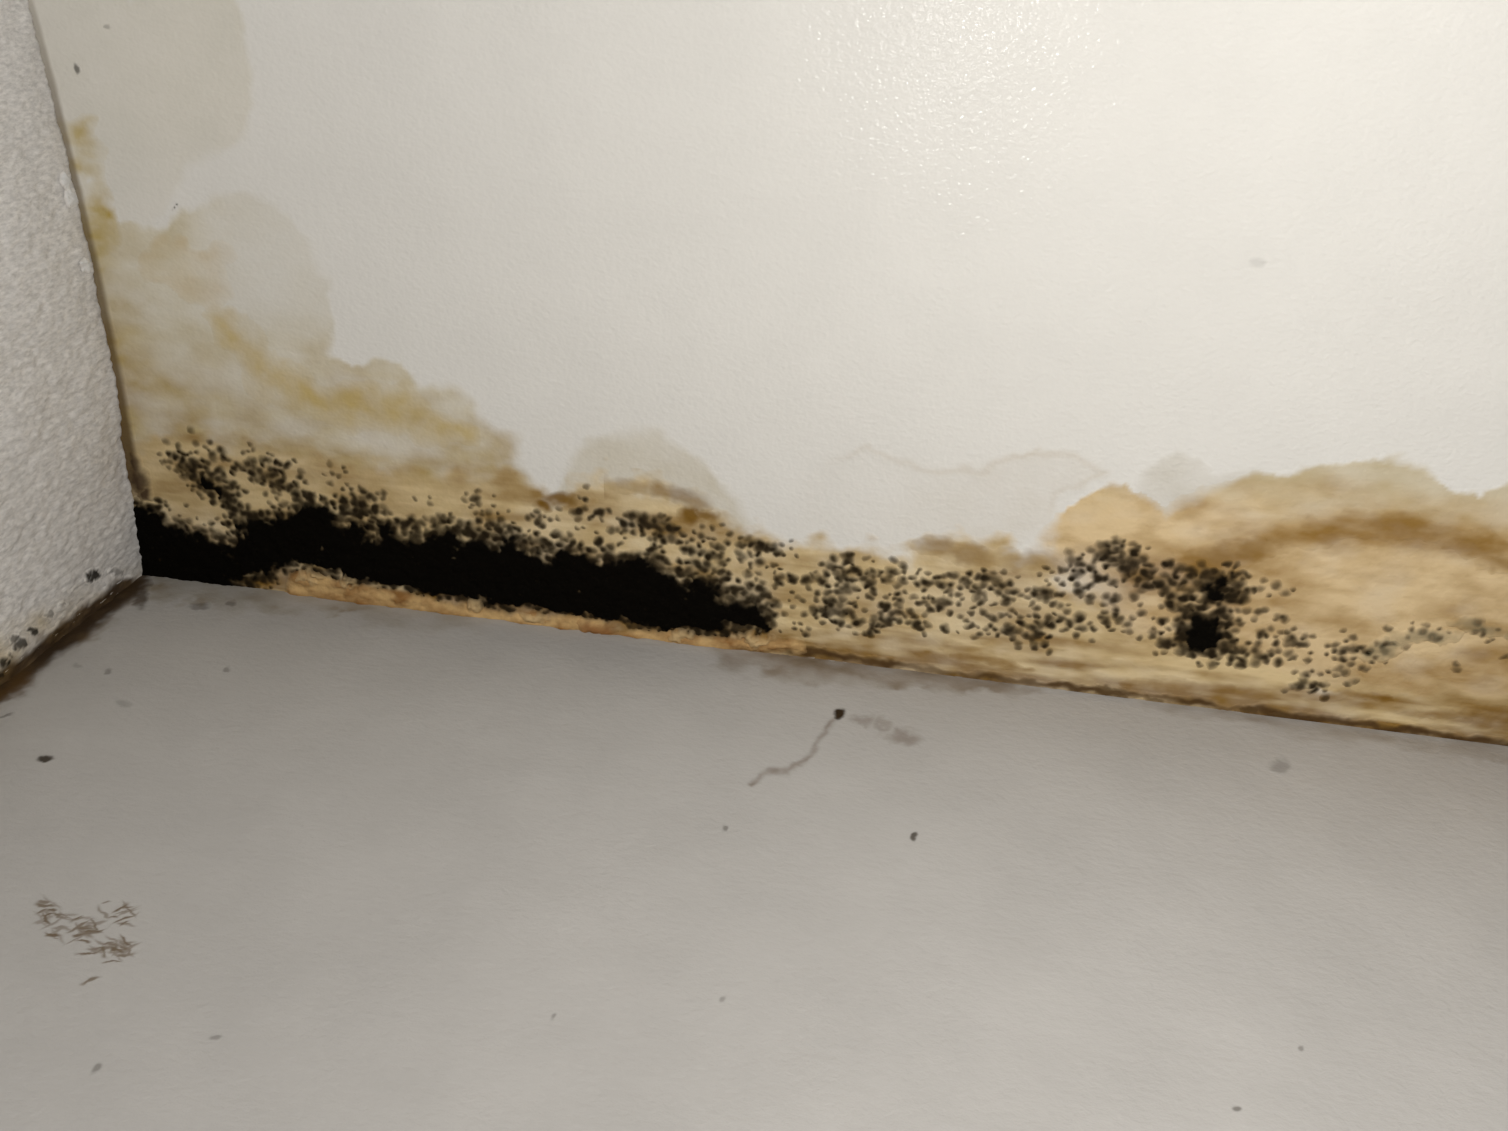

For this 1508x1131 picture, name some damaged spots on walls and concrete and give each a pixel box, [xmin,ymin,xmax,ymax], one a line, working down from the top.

water stain [0,0,1508,738]